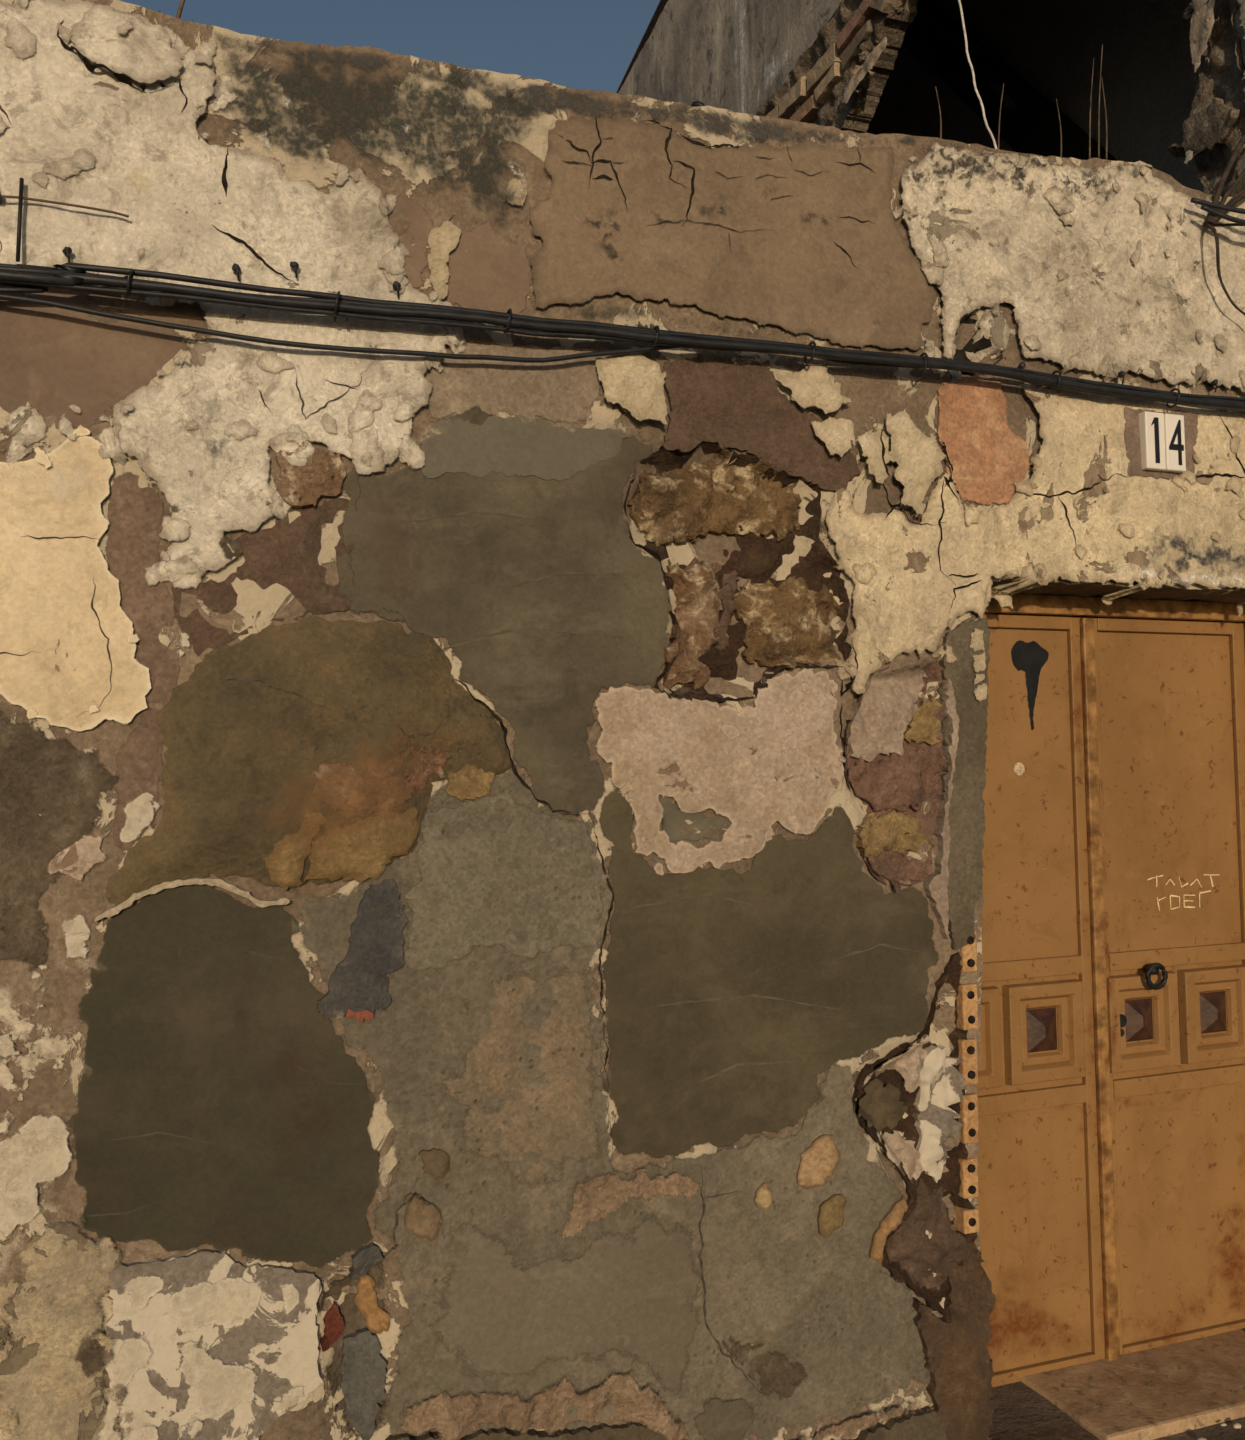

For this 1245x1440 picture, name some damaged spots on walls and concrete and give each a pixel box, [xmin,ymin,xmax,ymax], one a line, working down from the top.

crack [57,20,187,112]
flaking render [0,0,532,314]
leakage [220,0,844,215]
crack [558,116,874,252]
spalling [756,0,918,133]
crack [836,216,874,267]
flaking render [893,0,1245,392]
crack [1033,473,1138,541]
flaking render [0,290,1245,1440]